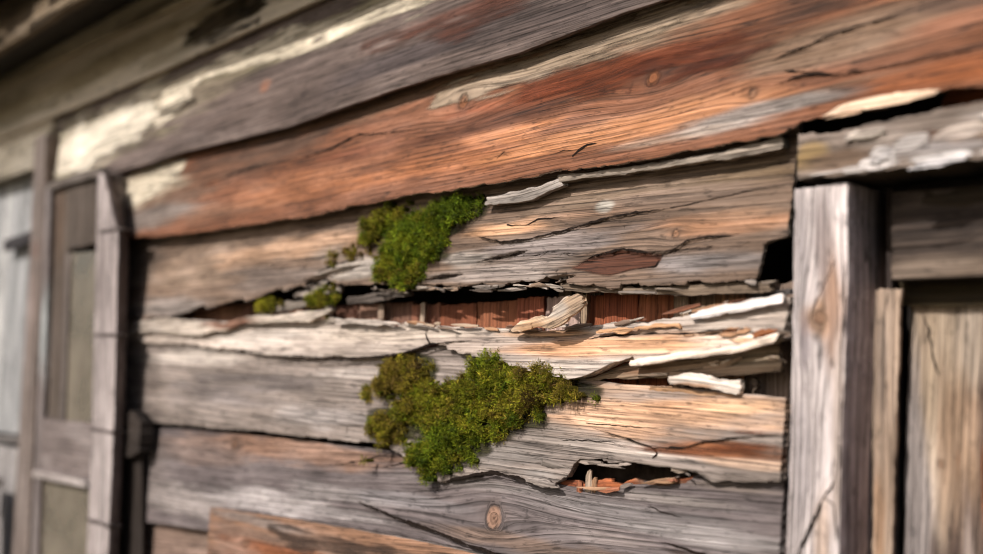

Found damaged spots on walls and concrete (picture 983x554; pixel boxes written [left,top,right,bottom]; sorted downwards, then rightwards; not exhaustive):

peeling [718,327,779,343]
crack [798,259,846,554]
crack [358,501,497,554]